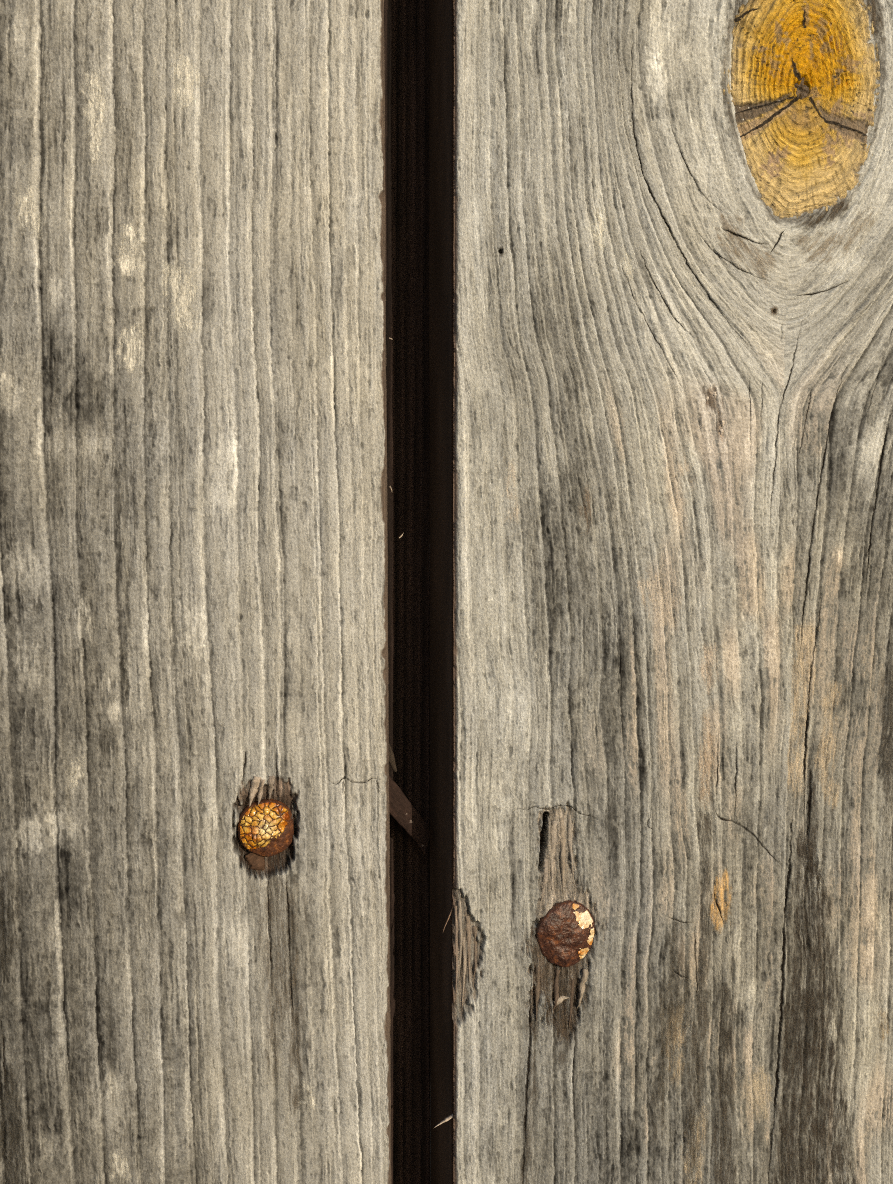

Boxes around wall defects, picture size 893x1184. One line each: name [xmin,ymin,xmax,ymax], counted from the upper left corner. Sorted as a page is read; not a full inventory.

crack [735,8,759,22]
crack [619,251,688,381]
crack [631,32,867,1184]